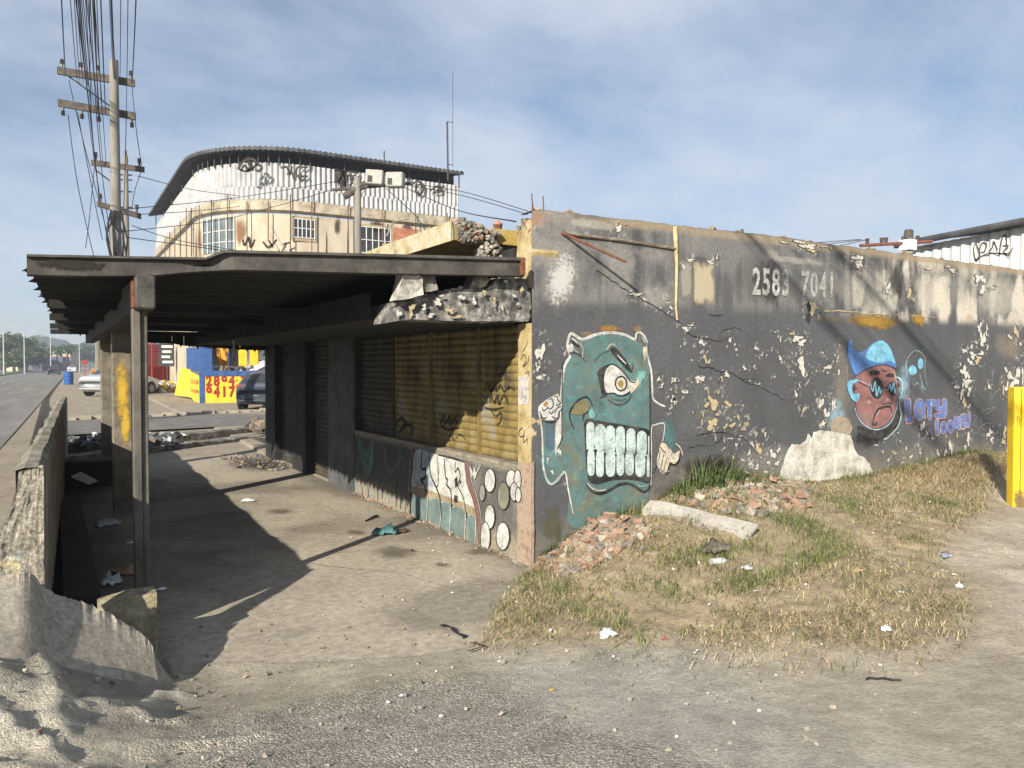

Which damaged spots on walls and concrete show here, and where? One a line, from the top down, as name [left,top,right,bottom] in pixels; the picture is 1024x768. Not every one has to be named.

spalling [452,217,503,257]
peeling [680,252,718,304]
peeling [395,279,524,320]
spalling [807,300,818,318]
crack [596,270,788,402]
peeling [953,321,989,409]
peeling [987,365,1024,396]
spalling [656,324,970,483]
peeling [985,425,1007,452]